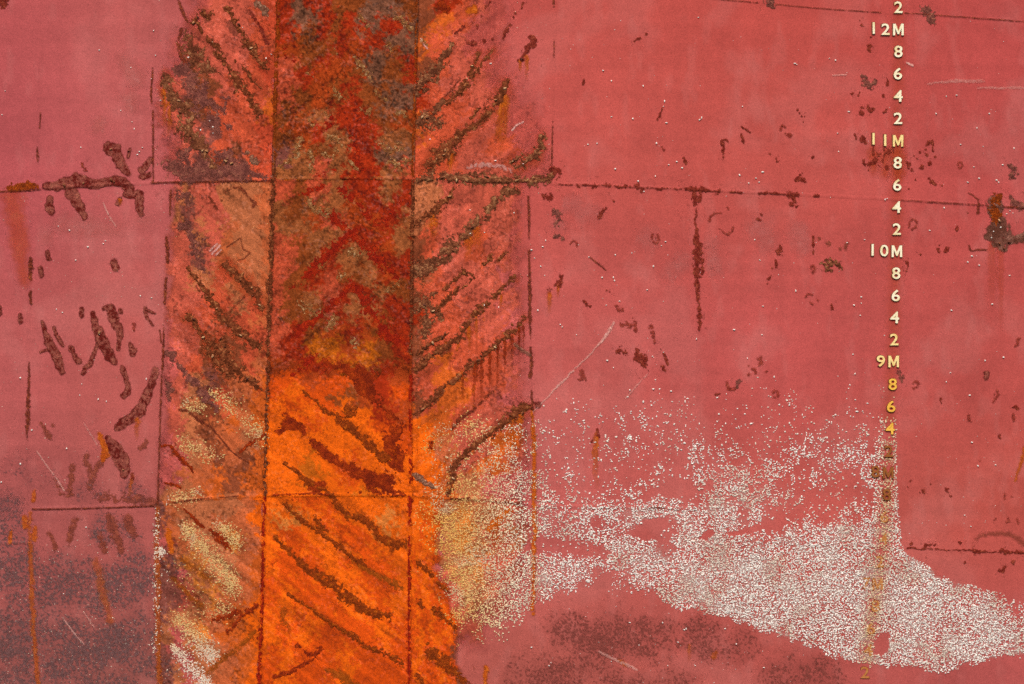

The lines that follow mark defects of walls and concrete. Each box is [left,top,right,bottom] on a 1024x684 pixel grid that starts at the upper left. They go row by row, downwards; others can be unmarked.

rust [850,74,889,116]
rust [758,172,806,208]
rust [854,133,1024,252]
rust [8,0,742,684]